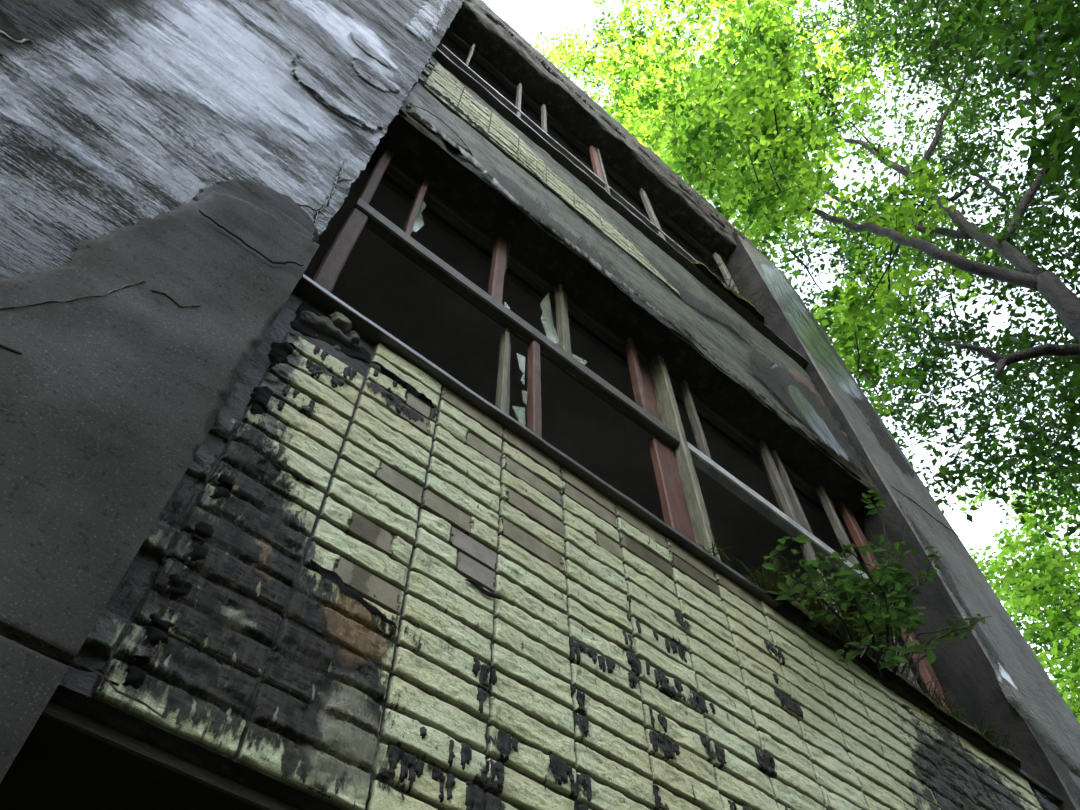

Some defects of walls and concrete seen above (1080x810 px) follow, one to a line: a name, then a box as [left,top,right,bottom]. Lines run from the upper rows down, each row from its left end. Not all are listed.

water stain [0,0,354,207]
water stain [284,0,405,99]
peeling [349,31,400,94]
peeling [192,179,319,266]
crack [0,343,22,354]
crack [0,281,200,310]
spalling [268,302,372,368]
peeling [377,463,497,591]
peeling [441,387,764,613]
peeling [334,556,401,612]
crack [0,631,162,716]
water stain [899,704,1063,810]